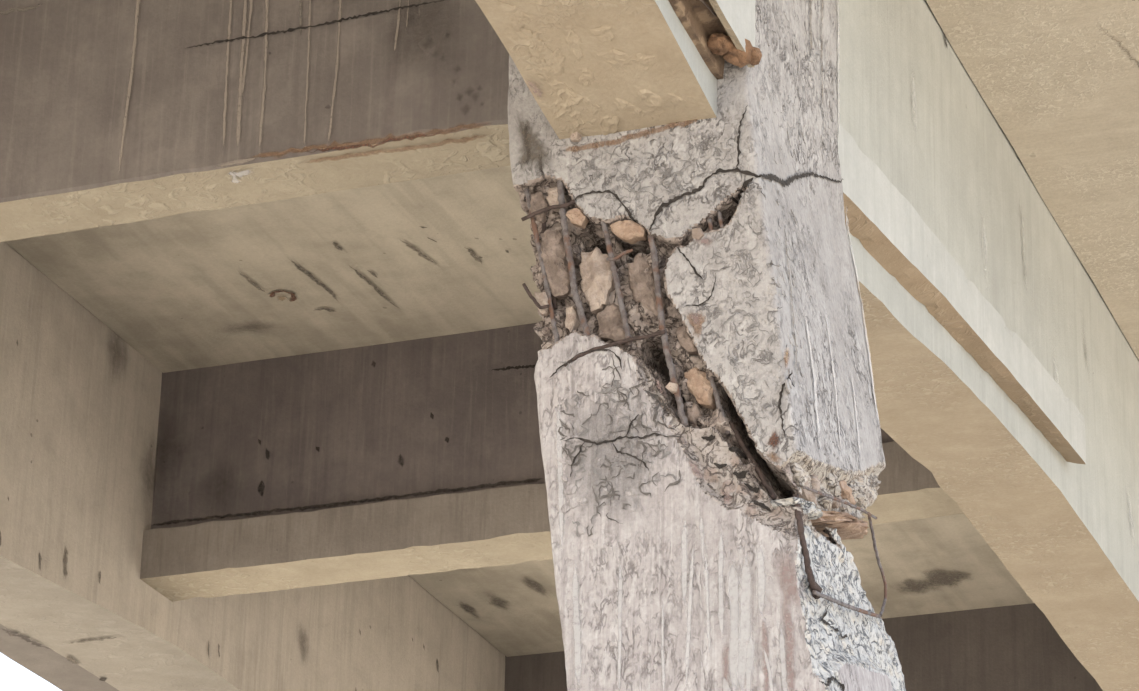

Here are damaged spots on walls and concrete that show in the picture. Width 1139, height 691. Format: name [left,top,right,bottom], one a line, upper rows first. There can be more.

crack [187,0,444,48]
crack [1096,25,1139,67]
crack [574,105,842,230]
crack [676,246,716,308]
crack [565,414,668,477]
spalling [513,138,906,691]
leakage [901,572,967,592]